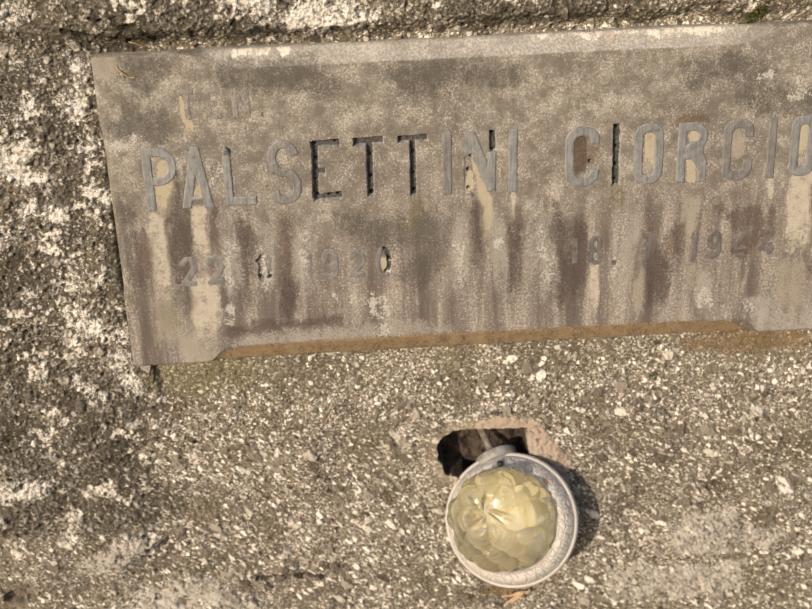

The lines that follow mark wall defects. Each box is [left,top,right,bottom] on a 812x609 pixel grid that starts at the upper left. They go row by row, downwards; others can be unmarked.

leakage [139,160,342,363]
leakage [464,159,495,265]
leakage [506,192,523,291]
leakage [547,203,600,312]
leakage [633,193,701,311]
leakage [685,159,697,183]
leakage [731,132,744,159]
leakage [716,178,775,258]
leakage [777,171,812,311]
leakage [799,124,809,159]
spalling [437,427,529,478]